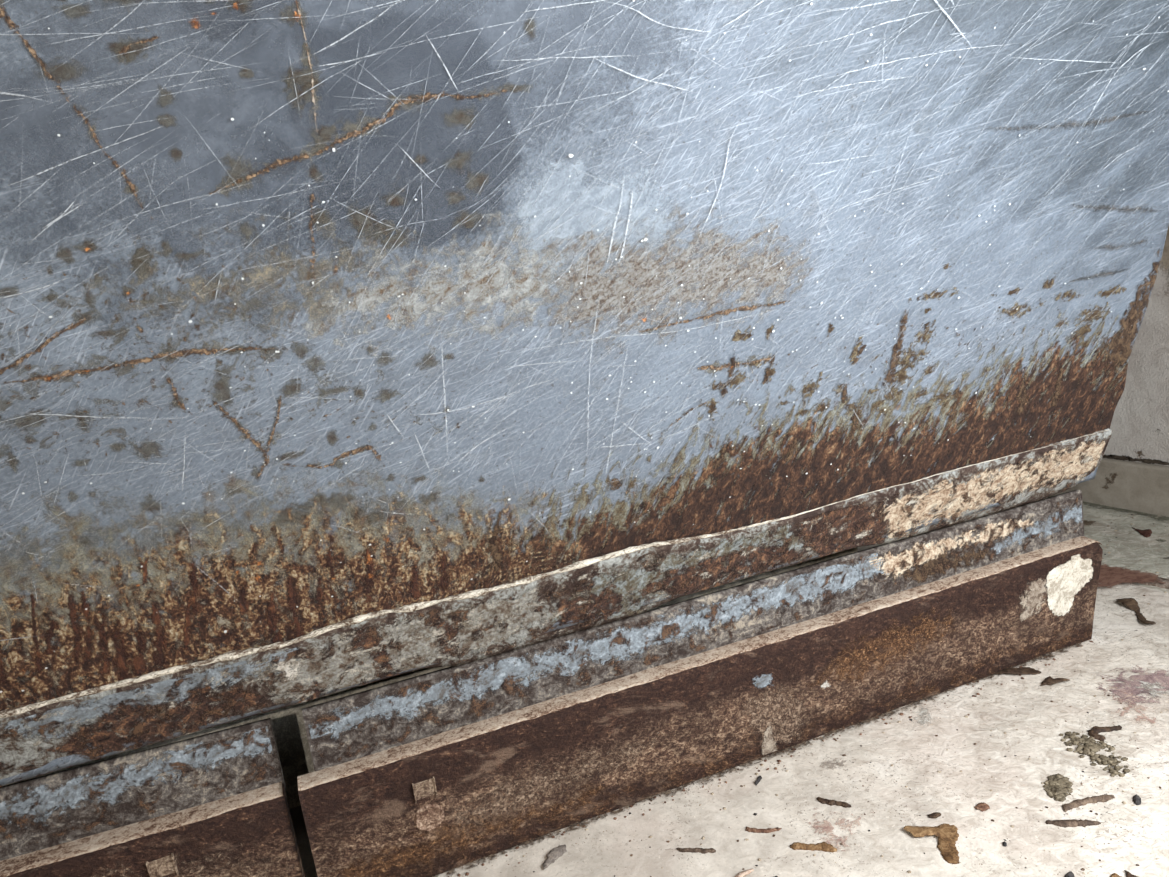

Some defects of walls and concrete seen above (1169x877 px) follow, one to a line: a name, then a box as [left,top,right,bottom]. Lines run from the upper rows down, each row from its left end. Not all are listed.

rust [48,241,97,274]
rust [534,214,813,344]
peeling [4,440,1105,741]
rust [0,248,1166,844]
peeling [0,726,272,829]
rust [162,853,281,877]
rust [344,732,659,877]